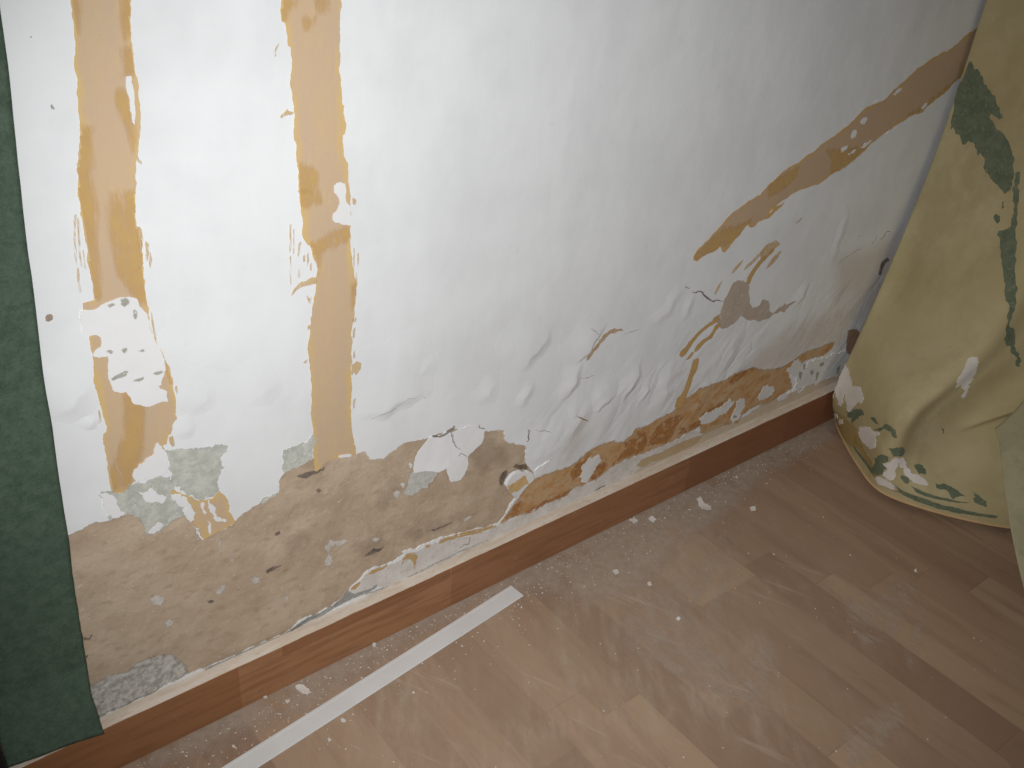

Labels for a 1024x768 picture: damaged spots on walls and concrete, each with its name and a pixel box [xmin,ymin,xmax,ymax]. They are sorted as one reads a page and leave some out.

peeling [693,26,978,261]
crack [685,286,720,302]
flaking render [68,0,535,718]
peeling [586,328,623,361]
crack [433,426,485,458]